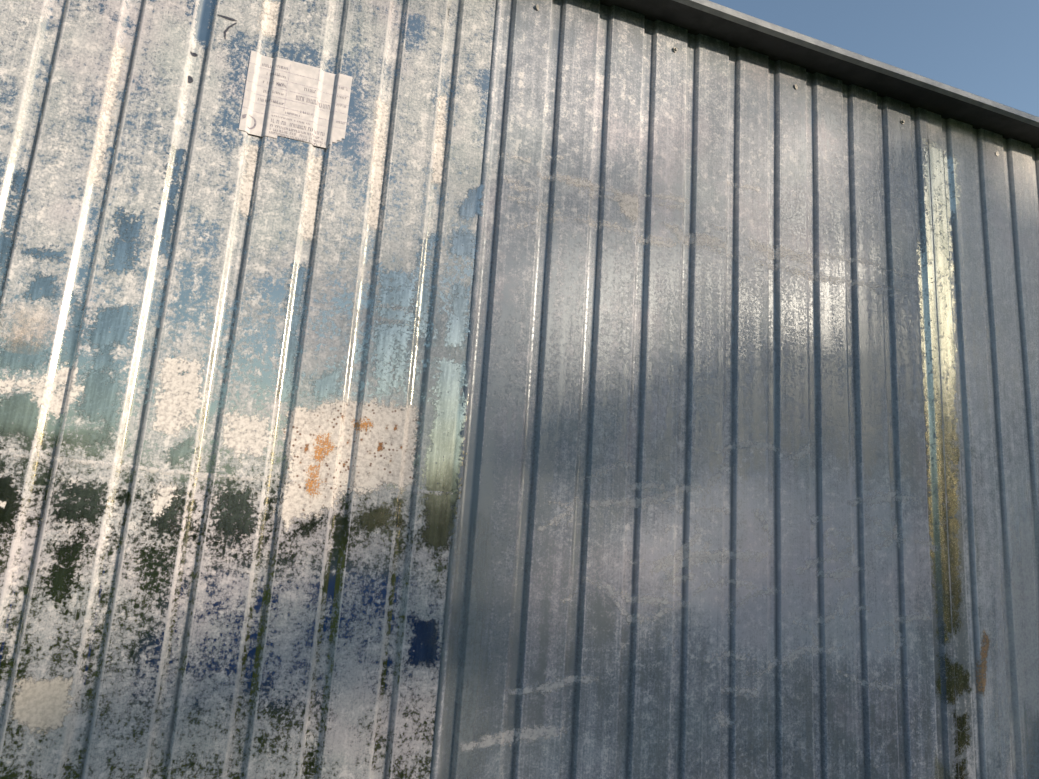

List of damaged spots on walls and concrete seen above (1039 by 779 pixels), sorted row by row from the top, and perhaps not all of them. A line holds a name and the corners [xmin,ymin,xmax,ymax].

damp [240,145,259,216]
damp [301,155,323,241]
damp [367,97,388,230]
damp [0,362,85,420]
damp [152,481,178,520]
damp [153,356,208,438]
corrosion [300,433,334,498]
damp [218,397,422,532]
corrosion [341,415,397,443]
damp [12,676,74,735]